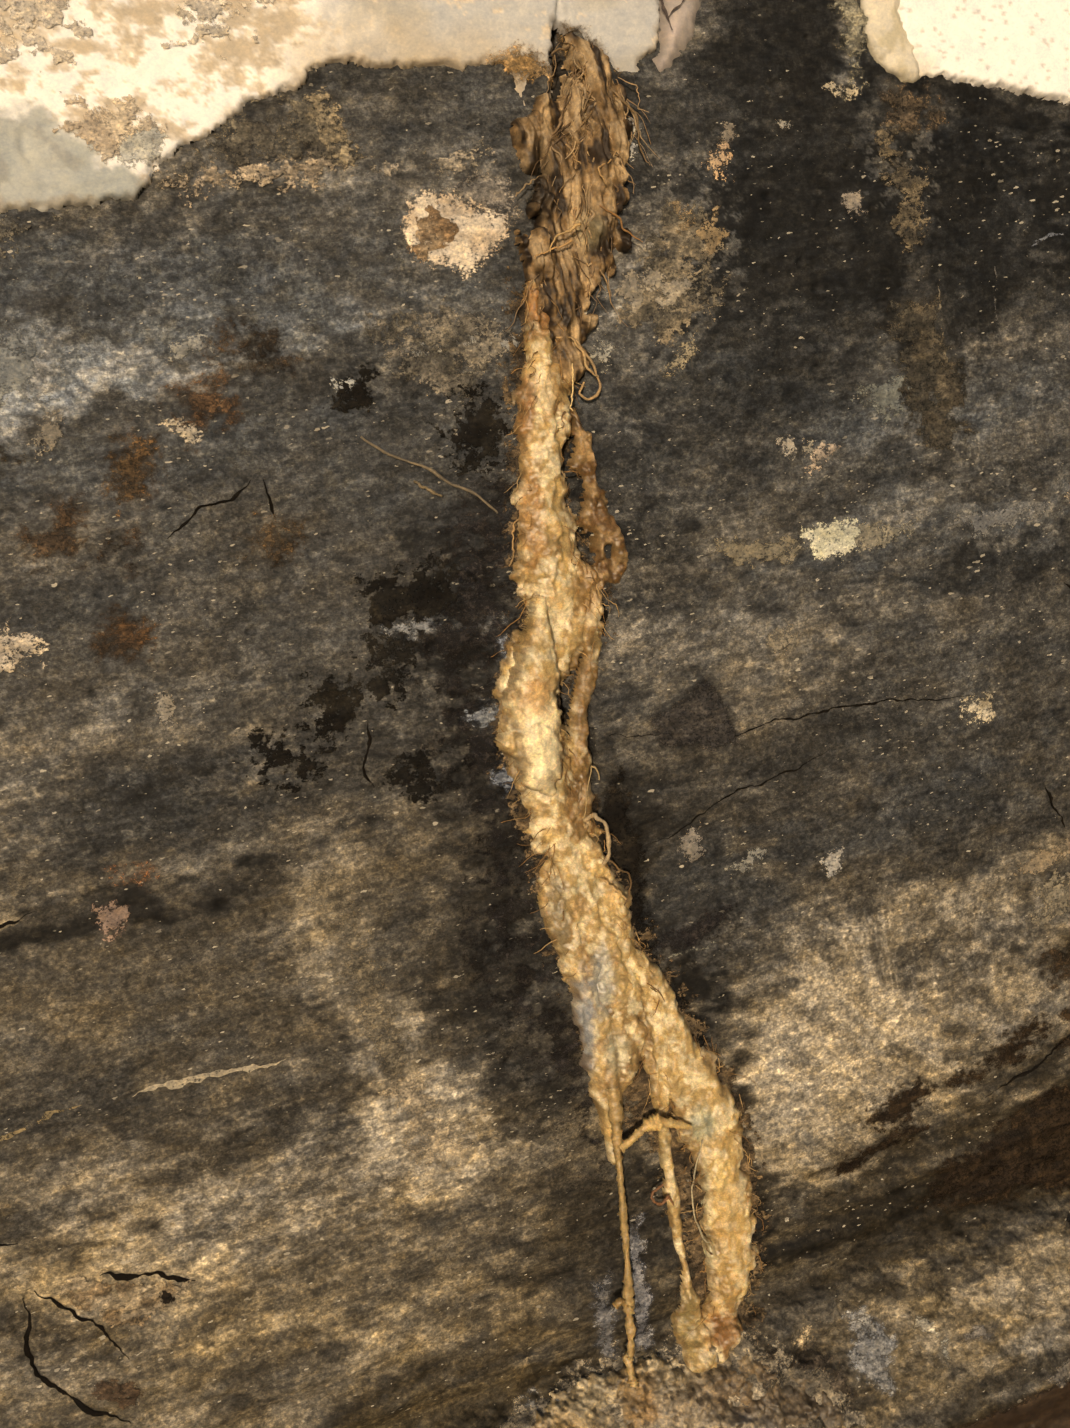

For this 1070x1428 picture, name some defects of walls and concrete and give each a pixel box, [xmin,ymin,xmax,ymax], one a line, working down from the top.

peeling [897,0,1070,106]
peeling [0,0,701,214]
leakage [452,165,522,226]
crack [735,695,977,737]
leakage [238,266,898,1428]
crack [655,752,826,842]
leakage [822,997,1070,1176]
leakage [915,1085,1070,1213]
crack [100,1271,195,1282]
crack [22,1291,131,1424]
leakage [914,1316,1004,1360]
leakage [952,1358,1070,1428]